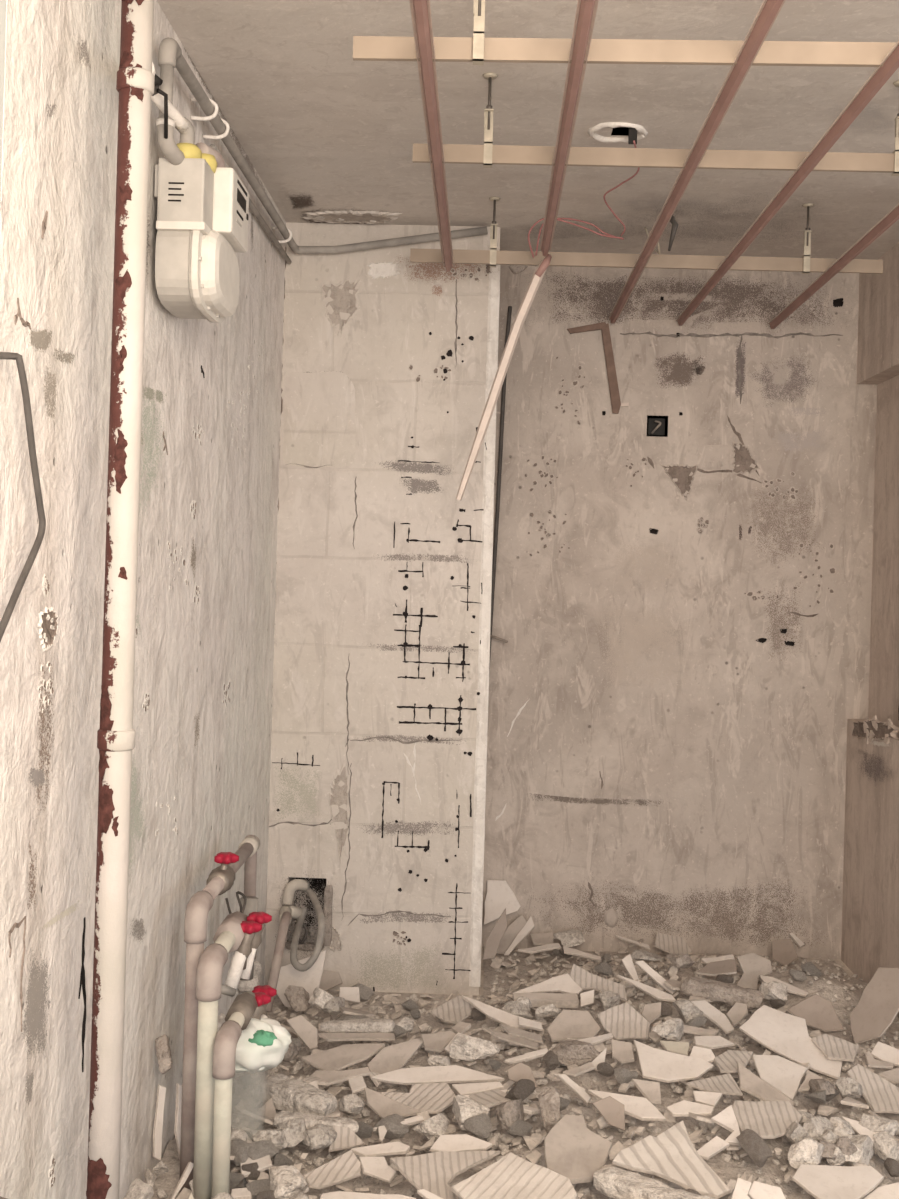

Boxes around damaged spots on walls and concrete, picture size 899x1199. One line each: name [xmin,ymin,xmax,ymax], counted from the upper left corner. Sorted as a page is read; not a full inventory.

corrosion [119,51,142,69]
corrosion [130,87,144,102]
corrosion [119,184,133,203]
corrosion [115,269,132,301]
corrosion [115,345,127,372]
corrosion [114,429,128,494]
spalling [37,573,59,713]
corrosion [100,685,114,731]
corrosion [98,750,119,837]
crack [269,656,459,924]
corrosion [86,1158,112,1199]